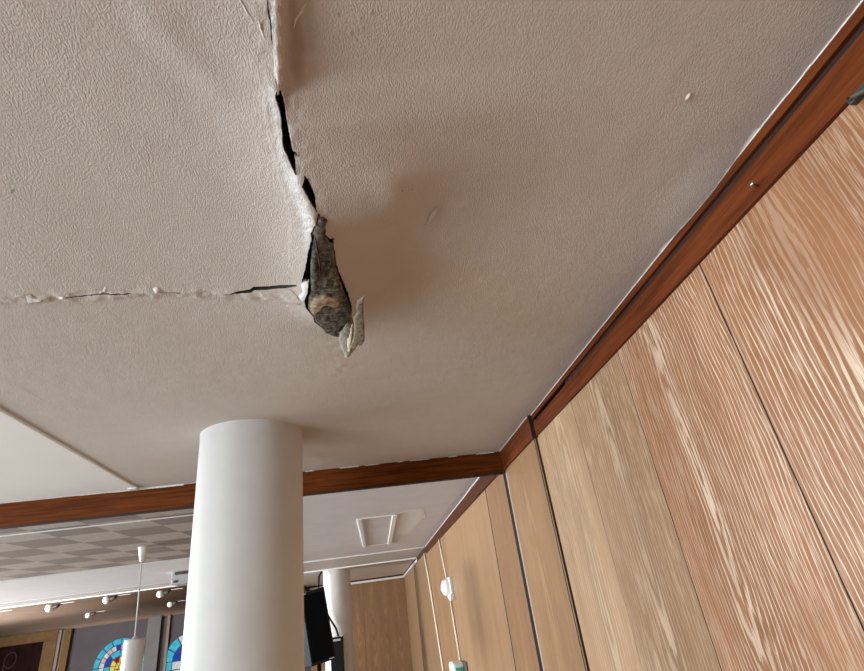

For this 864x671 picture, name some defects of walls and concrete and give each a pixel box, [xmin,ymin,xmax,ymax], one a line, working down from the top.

crack [26,0,317,304]
spalling [299,214,365,358]